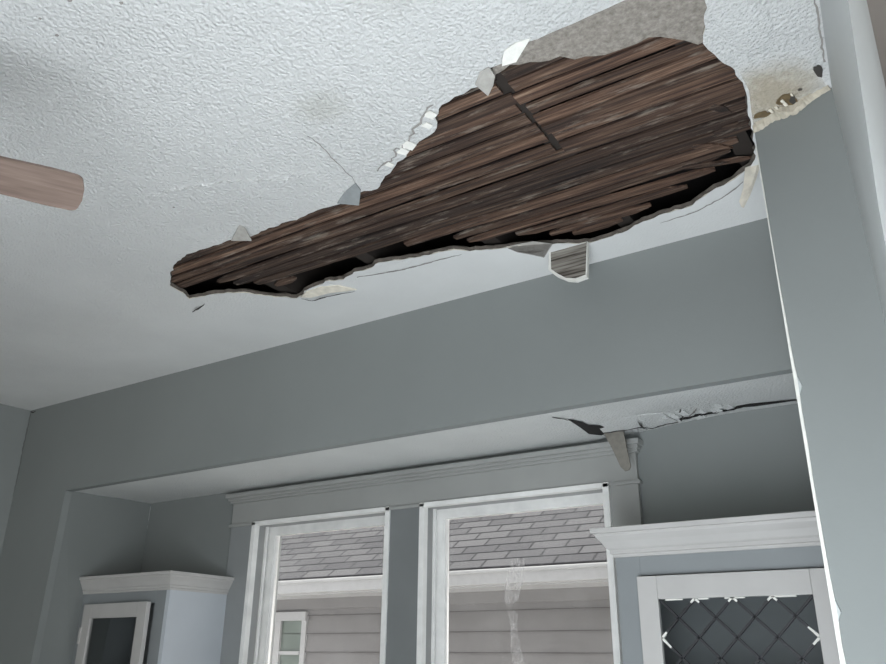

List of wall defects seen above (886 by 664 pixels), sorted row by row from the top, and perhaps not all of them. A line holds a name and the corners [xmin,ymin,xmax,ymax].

flaking render [475,0,707,96]
crack [307,136,355,183]
crack [377,105,437,171]
crack [659,399,797,424]